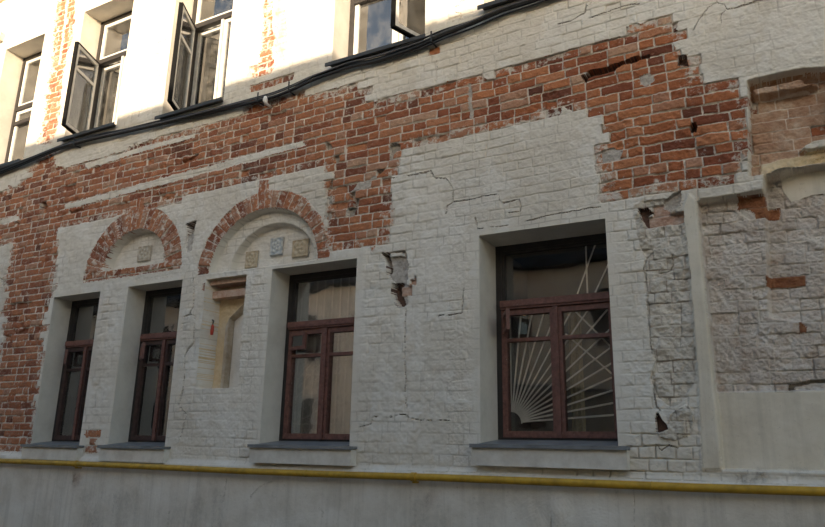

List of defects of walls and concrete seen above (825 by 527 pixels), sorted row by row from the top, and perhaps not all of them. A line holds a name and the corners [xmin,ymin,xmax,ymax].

crack [693,0,763,30]
peeling [810,125,825,137]
peeling [0,0,759,454]
crack [324,142,601,229]
flaking render [737,194,781,222]
crack [179,278,196,437]
crack [360,308,450,427]